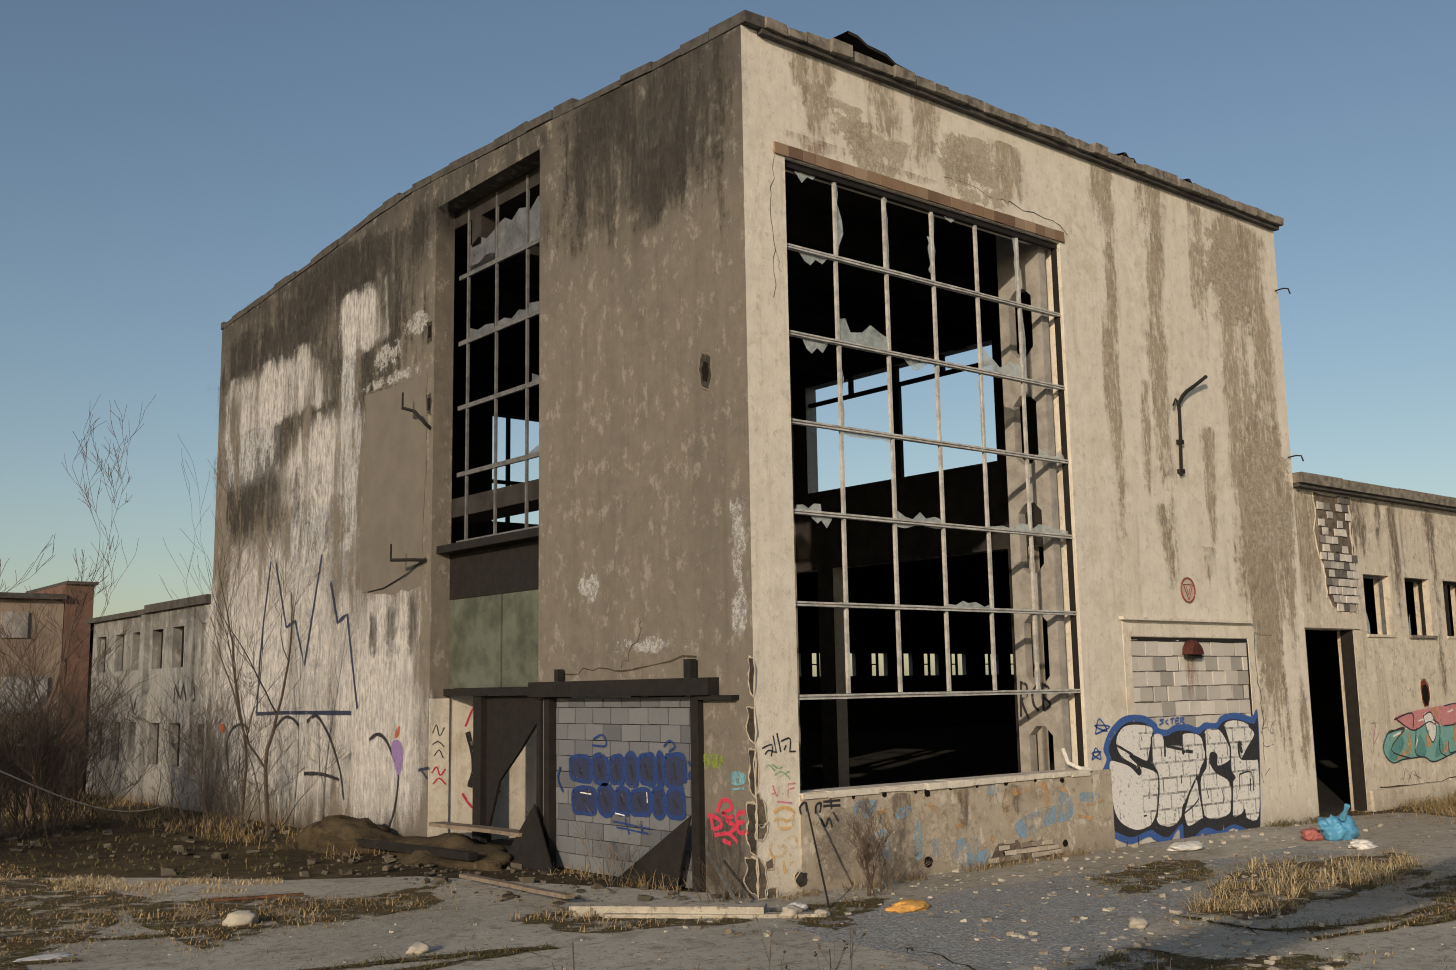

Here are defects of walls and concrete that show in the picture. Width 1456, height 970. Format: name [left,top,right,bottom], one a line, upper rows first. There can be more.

damp [566,34,732,252]
damp [791,52,967,184]
damp [992,141,1021,201]
damp [214,205,441,545]
damp [1090,164,1124,516]
damp [1135,184,1175,575]
damp [369,596,418,655]
peeling [730,497,747,636]
damp [1350,500,1401,606]
damp [1422,511,1439,602]
spalling [743,655,808,900]